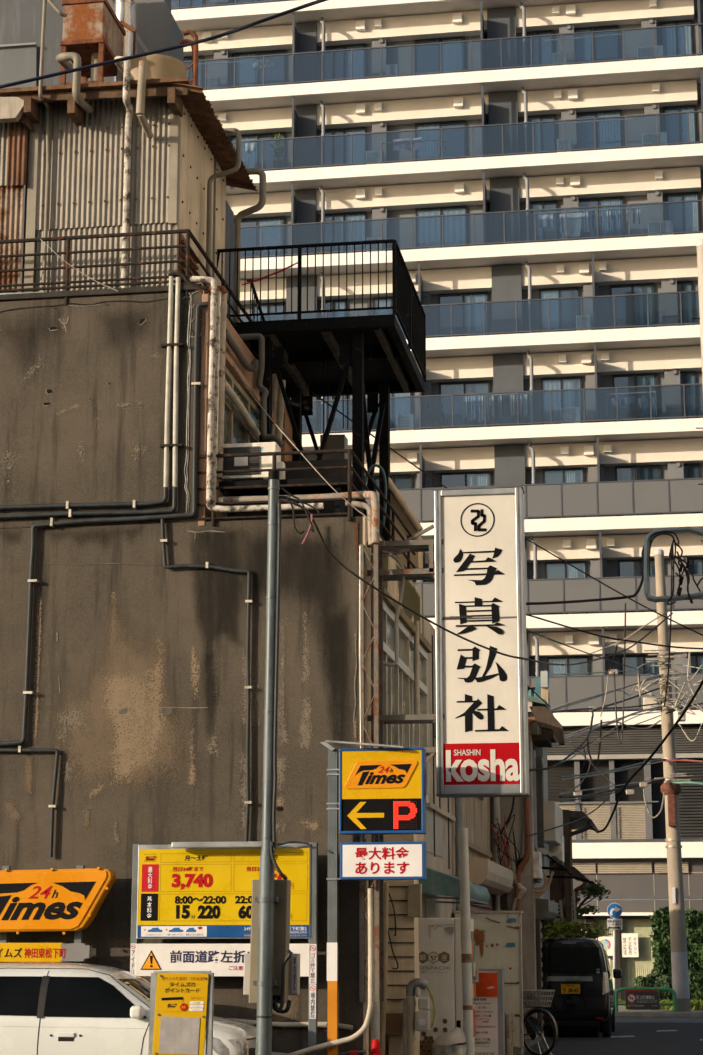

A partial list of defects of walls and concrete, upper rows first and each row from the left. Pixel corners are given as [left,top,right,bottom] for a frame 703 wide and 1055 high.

rust [6,122,28,186]
damp [189,532,267,719]
damp [277,527,346,792]
damp [188,724,220,786]